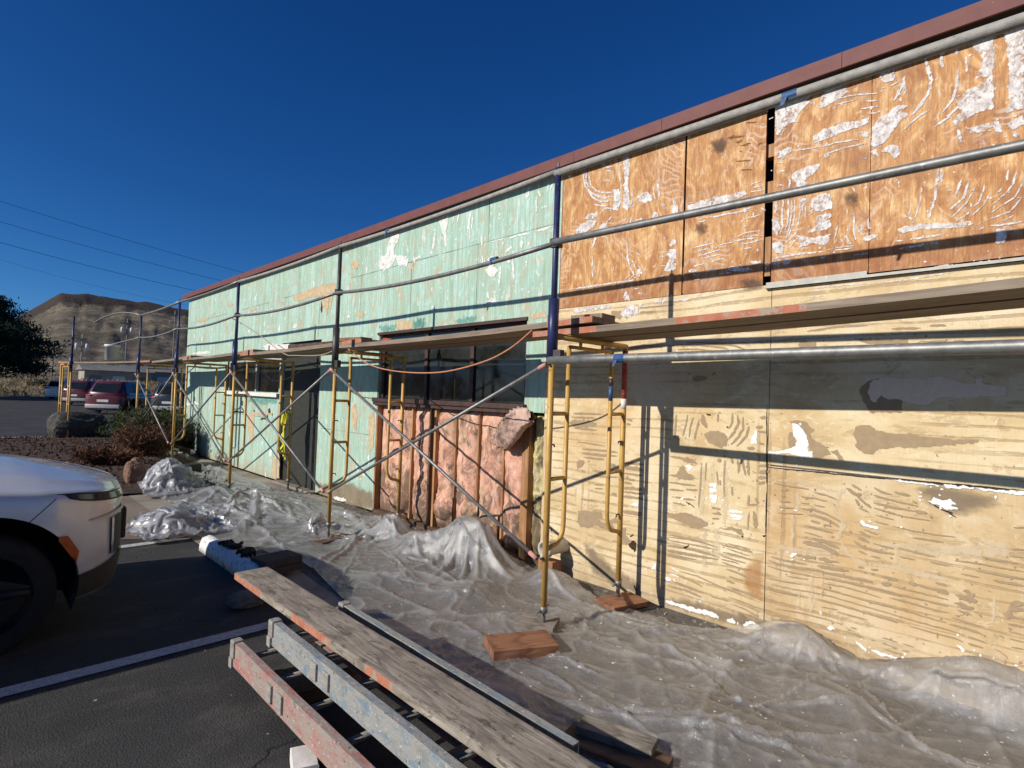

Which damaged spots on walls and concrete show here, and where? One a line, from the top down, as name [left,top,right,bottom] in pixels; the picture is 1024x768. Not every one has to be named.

peeling [569,27,1024,318]
peeling [263,208,552,348]
peeling [768,413,844,466]
peeling [853,376,1006,457]
peeling [919,479,958,517]